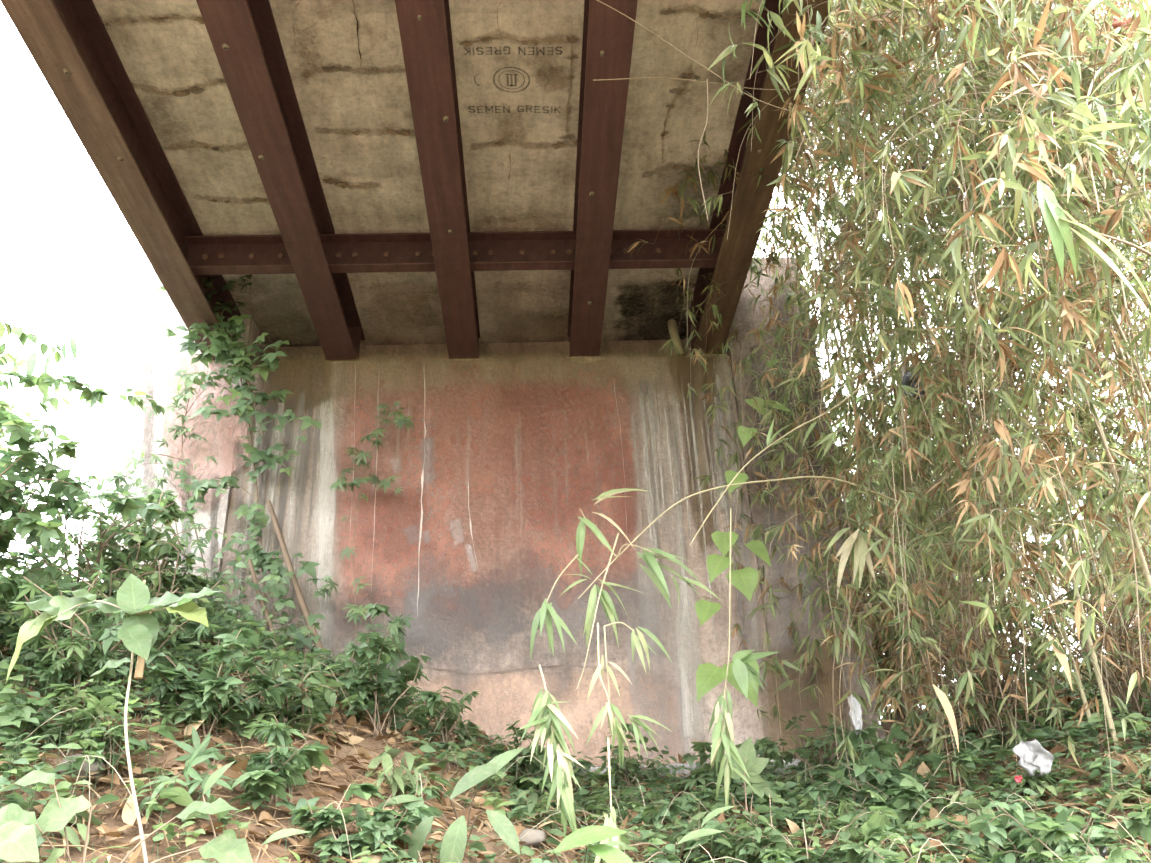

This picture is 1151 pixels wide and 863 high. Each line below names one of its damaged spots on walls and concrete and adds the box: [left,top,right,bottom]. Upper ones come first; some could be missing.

crack [303,0,405,78]
damp [236,333,700,768]
rust [336,358,642,625]
damp [477,353,742,599]
damp [617,279,696,341]
damp [751,300,793,491]